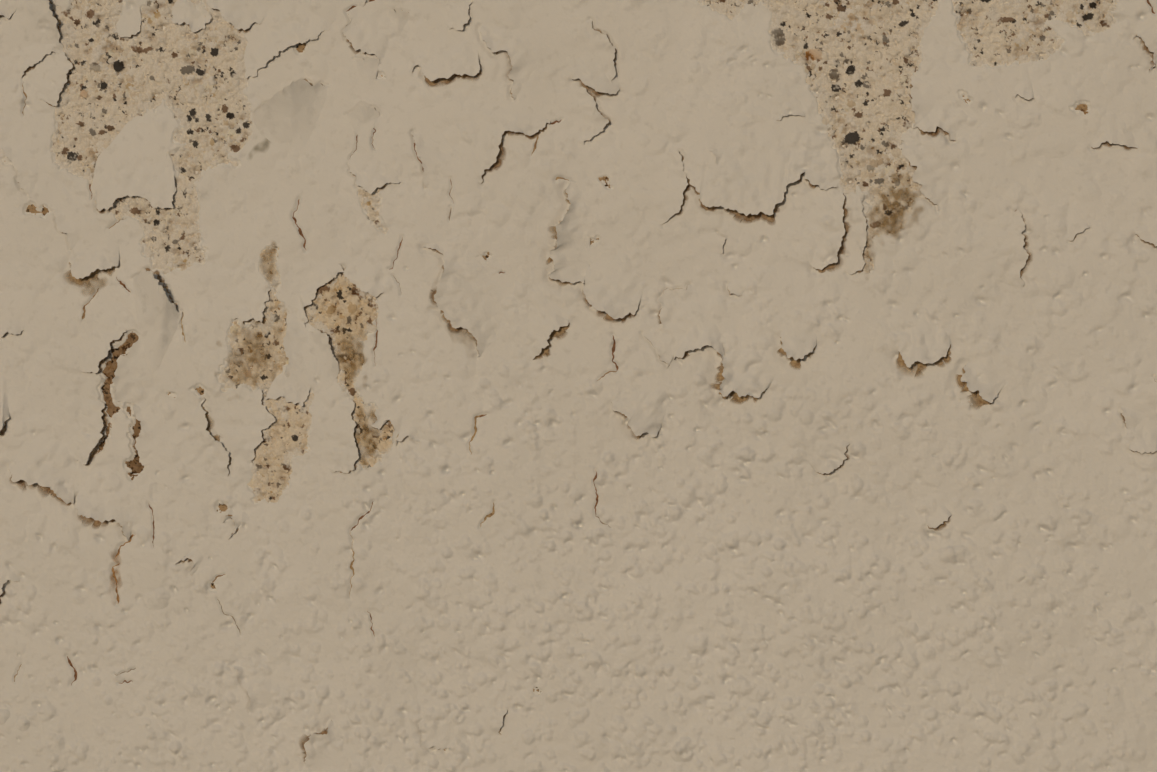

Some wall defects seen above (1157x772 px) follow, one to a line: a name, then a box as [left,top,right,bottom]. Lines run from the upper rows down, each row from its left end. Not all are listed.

peeling [466,20,620,183]
peeling [682,0,1117,275]
peeling [0,0,330,505]
crack [292,199,306,249]
peeling [218,246,405,503]
peeling [423,241,503,357]
crack [597,336,618,381]
peeling [897,319,951,373]
crack [469,414,487,454]
crack [593,472,609,526]
crack [349,502,375,637]
crack [67,657,77,685]